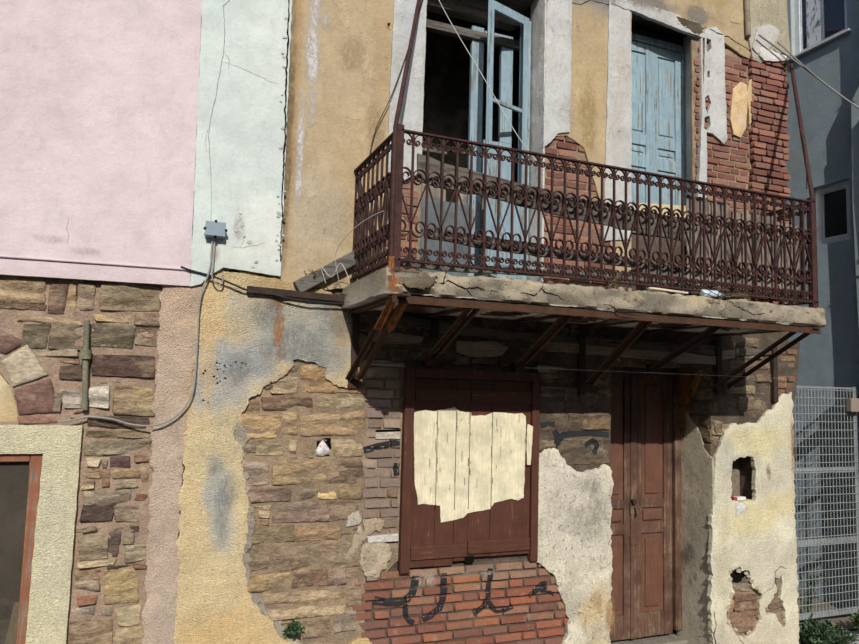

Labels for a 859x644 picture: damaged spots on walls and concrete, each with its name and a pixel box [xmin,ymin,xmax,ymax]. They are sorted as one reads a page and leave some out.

crack [205,0,274,212]
spalling [677,15,791,241]
crack [398,269,498,296]
crack [522,283,564,300]
spalling [717,270,788,305]
spalling [238,304,800,644]